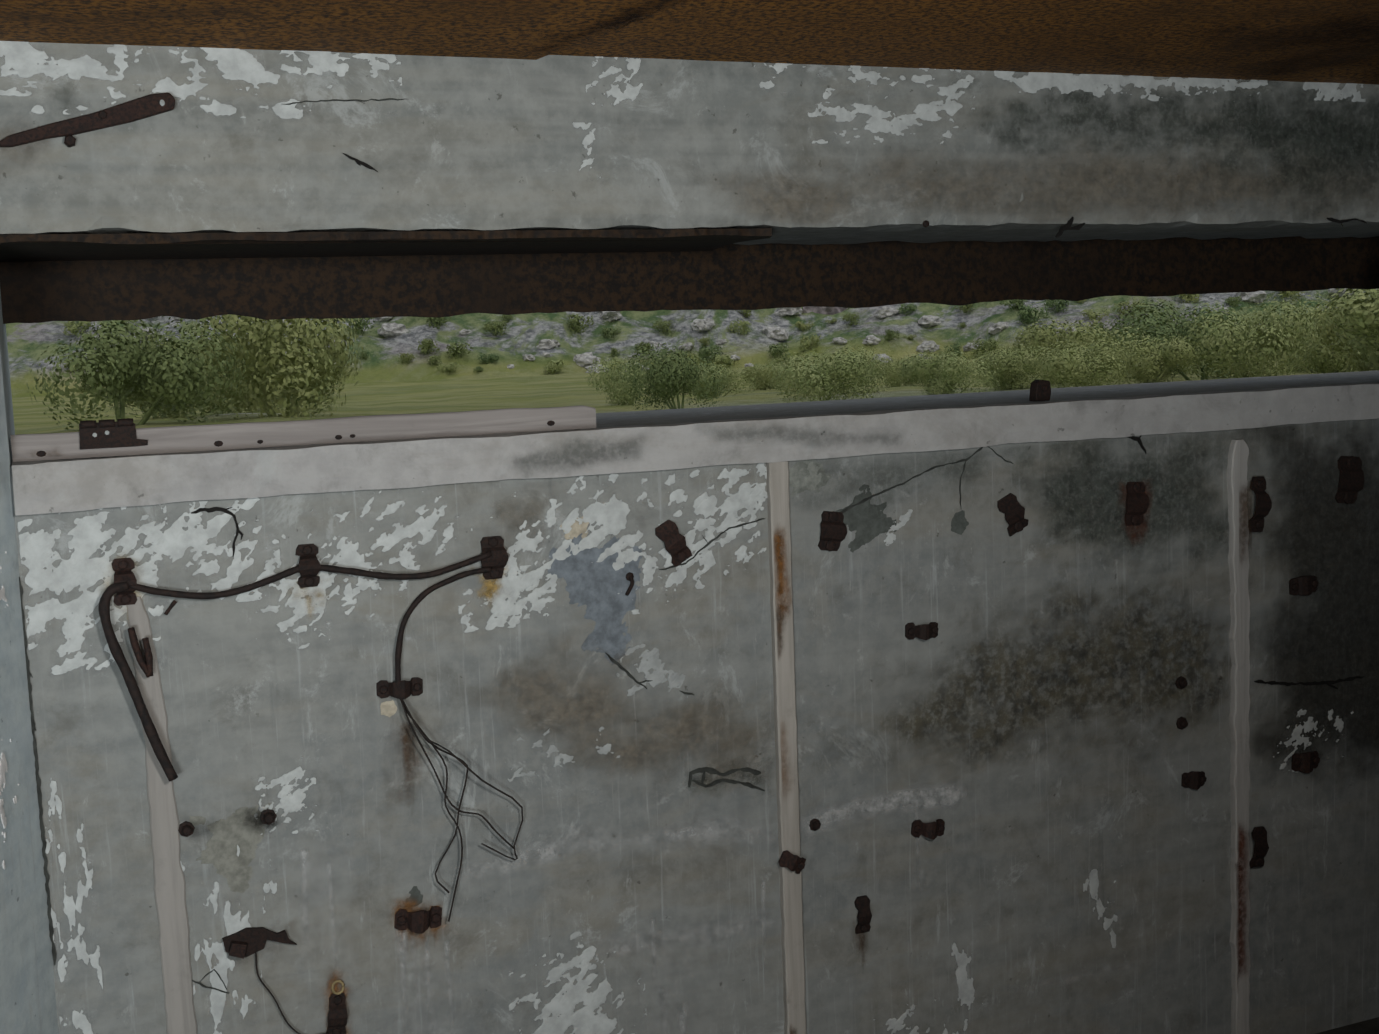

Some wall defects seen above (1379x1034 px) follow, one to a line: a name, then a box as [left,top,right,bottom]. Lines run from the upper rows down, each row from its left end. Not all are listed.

peeling [0,41,402,119]
peeling [754,63,975,144]
peeling [994,71,1268,101]
leakage [1060,92,1379,187]
peeling [0,489,459,675]
corrosion [774,533,789,652]
leakage [1261,426,1379,757]
peeling [0,739,19,842]
peeling [509,931,647,1034]